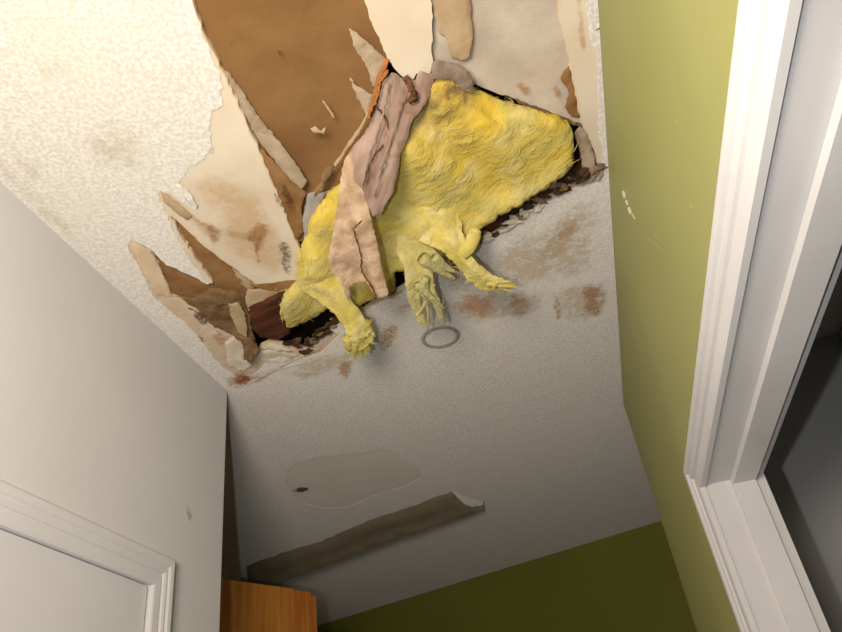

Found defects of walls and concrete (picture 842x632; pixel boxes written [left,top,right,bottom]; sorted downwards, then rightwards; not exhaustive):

peeling [159,31,299,284]
peeling [531,0,609,204]
peeling [128,239,339,376]